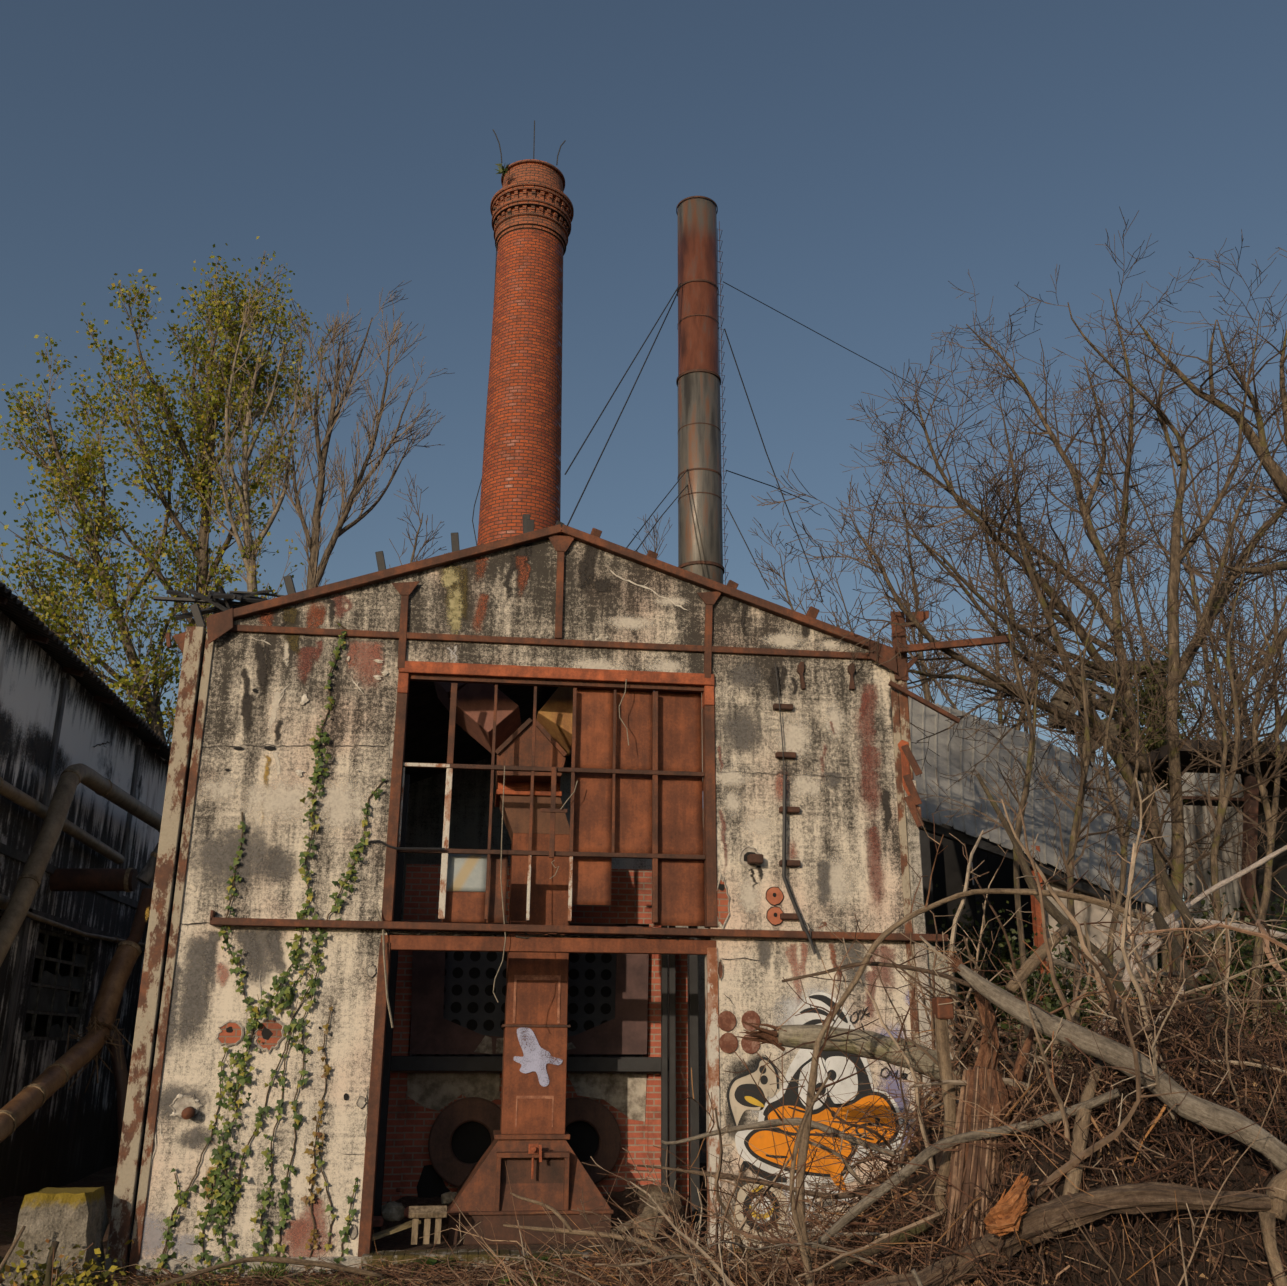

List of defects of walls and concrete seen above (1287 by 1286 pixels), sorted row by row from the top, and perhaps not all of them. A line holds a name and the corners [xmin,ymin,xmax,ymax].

rust [858,685,880,810]
rust [719,811,727,858]
rust [867,827,883,899]
damp [238,928,286,982]
damp [164,932,220,1056]